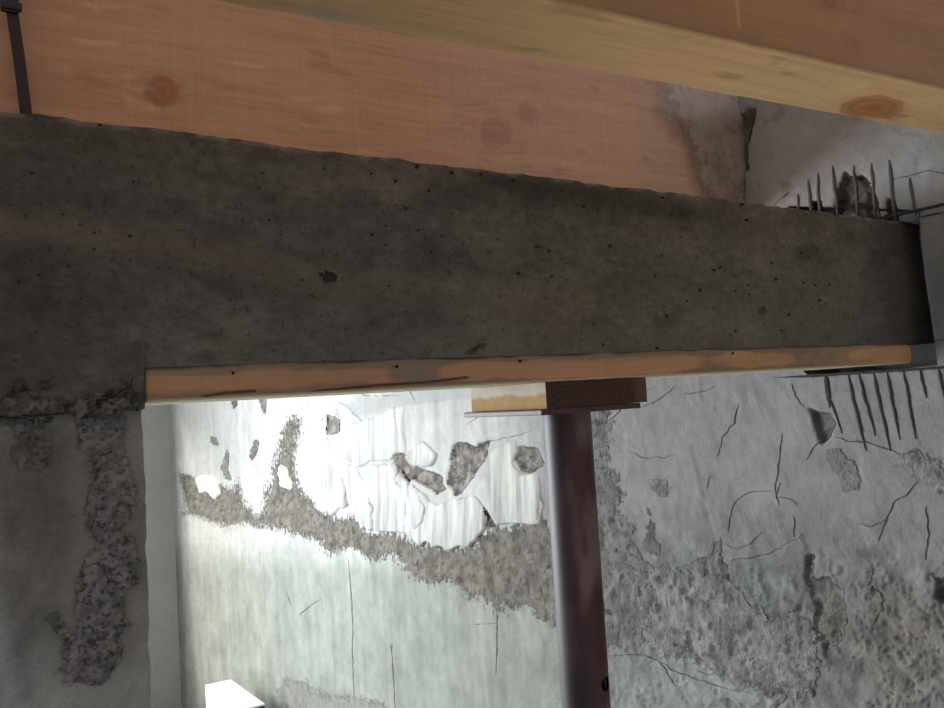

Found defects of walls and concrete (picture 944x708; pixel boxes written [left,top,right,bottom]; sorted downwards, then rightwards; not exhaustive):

spalling [740,108,756,172]
spalling [813,172,902,228]
crack [0,375,138,419]
crack [607,385,716,422]
crack [706,404,739,490]
spalling [809,409,861,493]
crack [806,437,900,460]
flaking render [176,402,556,628]
spalling [591,410,847,699]
crack [675,435,802,568]
crack [855,481,930,558]
crack [608,654,748,693]